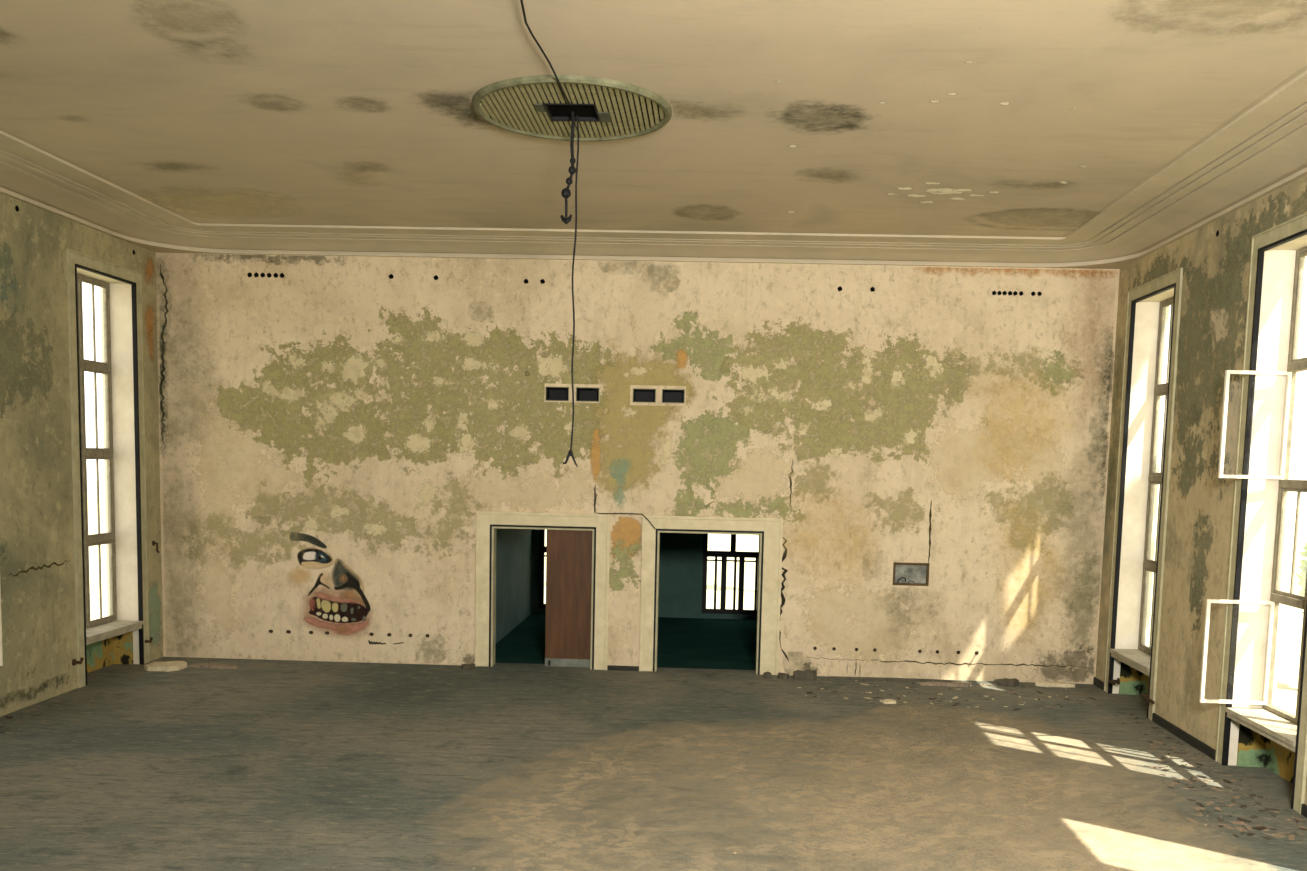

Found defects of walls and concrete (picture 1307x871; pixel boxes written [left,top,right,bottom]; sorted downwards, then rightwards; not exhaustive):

peeling [887,182,999,203]
peeling [1127,180,1307,499]
peeling [175,307,615,565]
peeling [651,311,1083,522]
peeling [867,488,939,534]
peeling [982,475,1075,554]
peeling [1189,510,1213,640]